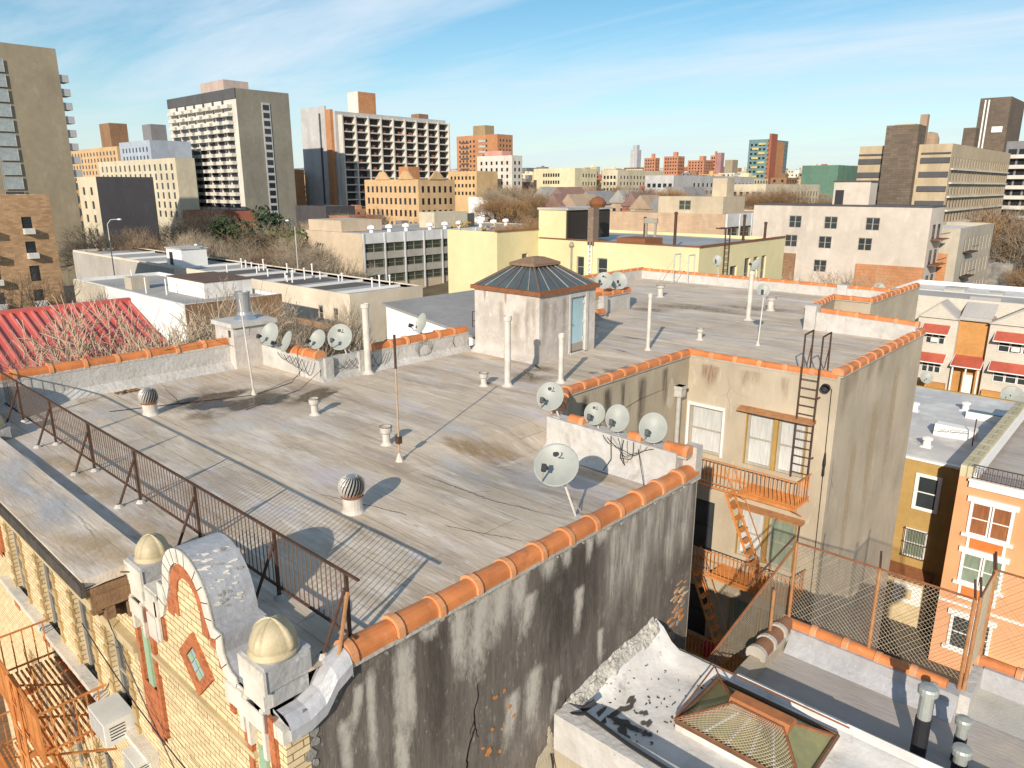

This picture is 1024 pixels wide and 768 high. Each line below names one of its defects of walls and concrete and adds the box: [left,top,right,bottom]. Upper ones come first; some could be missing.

peeling [193,546,245,607]
damp [451,574,534,670]
damp [542,485,692,647]
spalling [667,580,689,638]
damp [339,673,376,768]
damp [395,645,416,768]
crack [466,685,479,768]
damp [504,666,542,734]
damp [551,678,559,715]